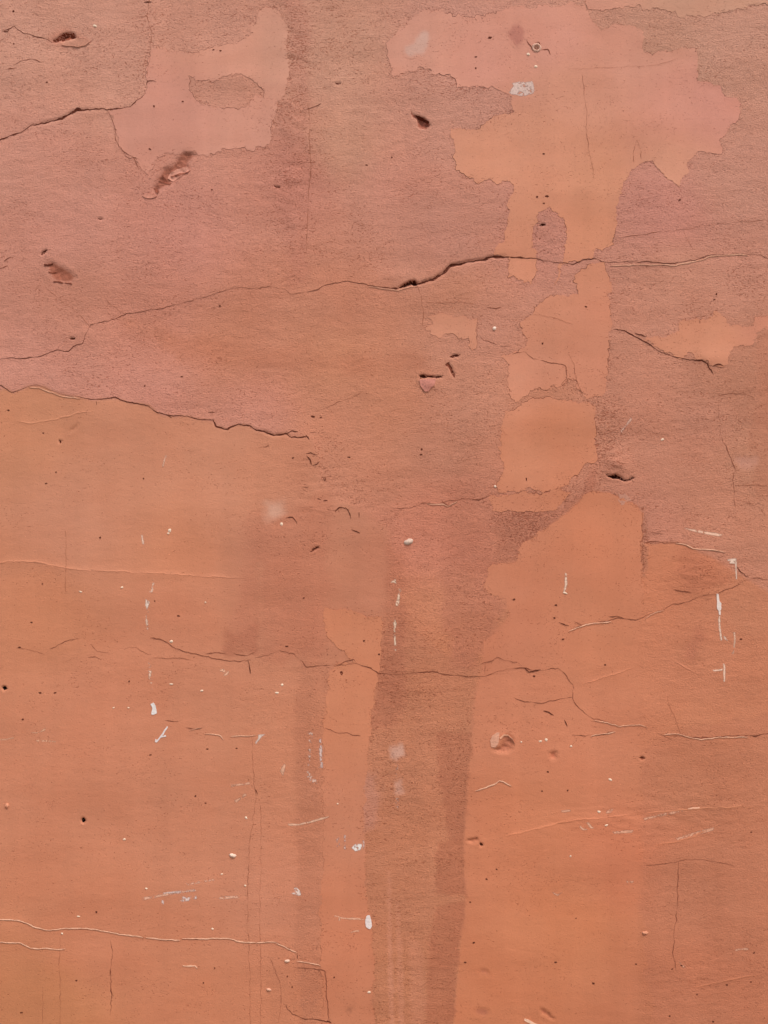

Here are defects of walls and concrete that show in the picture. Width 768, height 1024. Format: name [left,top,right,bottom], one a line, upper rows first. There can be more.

crack [0,0,156,171]
peeling [109,7,290,198]
crack [3,220,766,359]
crack [484,340,583,395]
crack [615,329,752,405]
peeling [289,0,768,1024]
water stain [362,540,414,847]
crack [21,638,768,740]
crack [0,720,331,1024]
water stain [384,728,477,1024]